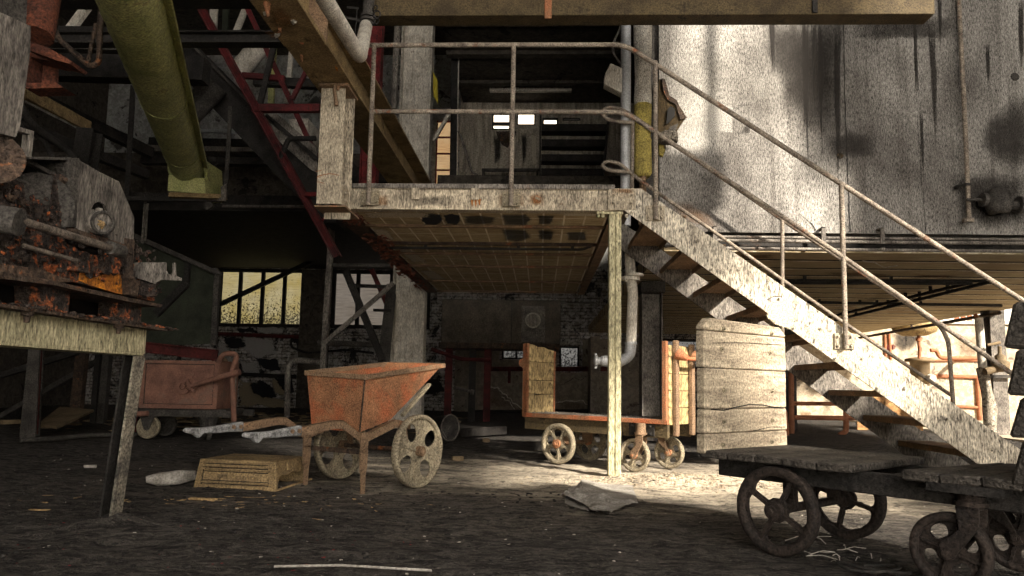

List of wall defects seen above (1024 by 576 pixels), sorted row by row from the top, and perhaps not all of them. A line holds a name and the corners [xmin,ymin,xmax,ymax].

damp [914,0,942,172]
peeling [218,327,295,398]